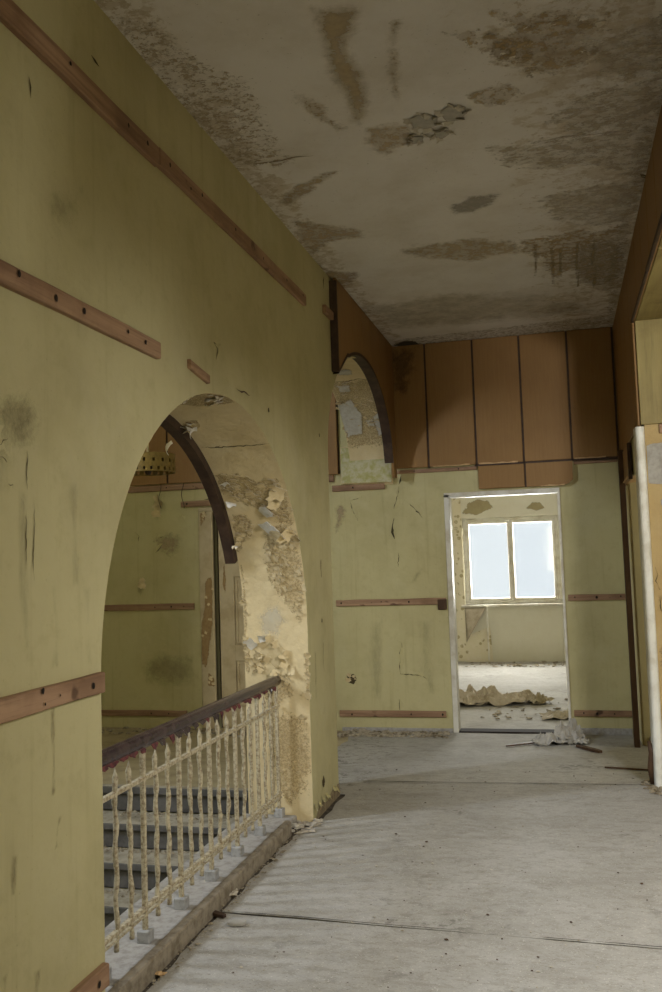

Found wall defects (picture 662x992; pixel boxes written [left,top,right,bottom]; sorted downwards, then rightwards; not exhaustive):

damp [322,12,364,113]
spalling [403,103,472,147]
damp [487,14,662,226]
damp [453,195,496,212]
spalling [332,380,392,483]
spalling [646,442,662,484]
crack [391,477,422,562]
peeling [102,474,312,803]